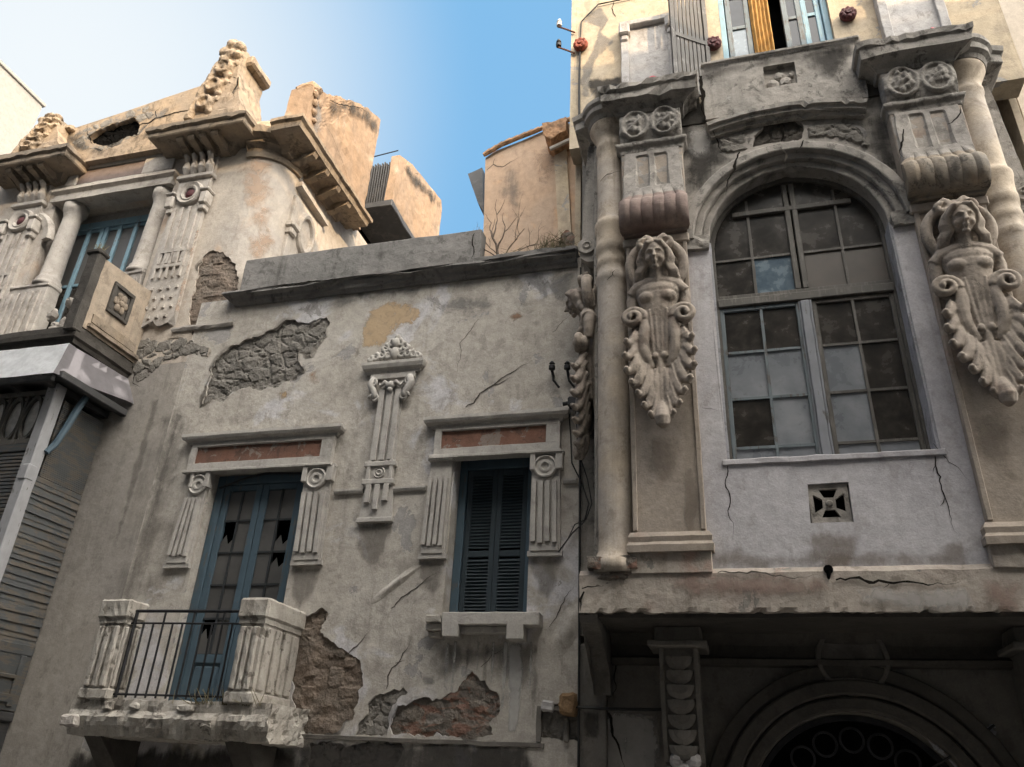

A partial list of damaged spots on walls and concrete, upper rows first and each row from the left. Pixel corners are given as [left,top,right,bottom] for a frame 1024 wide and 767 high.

spalling [72,106,154,151]
spalling [131,252,330,408]
crack [466,364,525,407]
crack [725,466,734,532]
crack [930,443,964,529]
crack [718,571,961,587]
spalling [292,608,500,749]